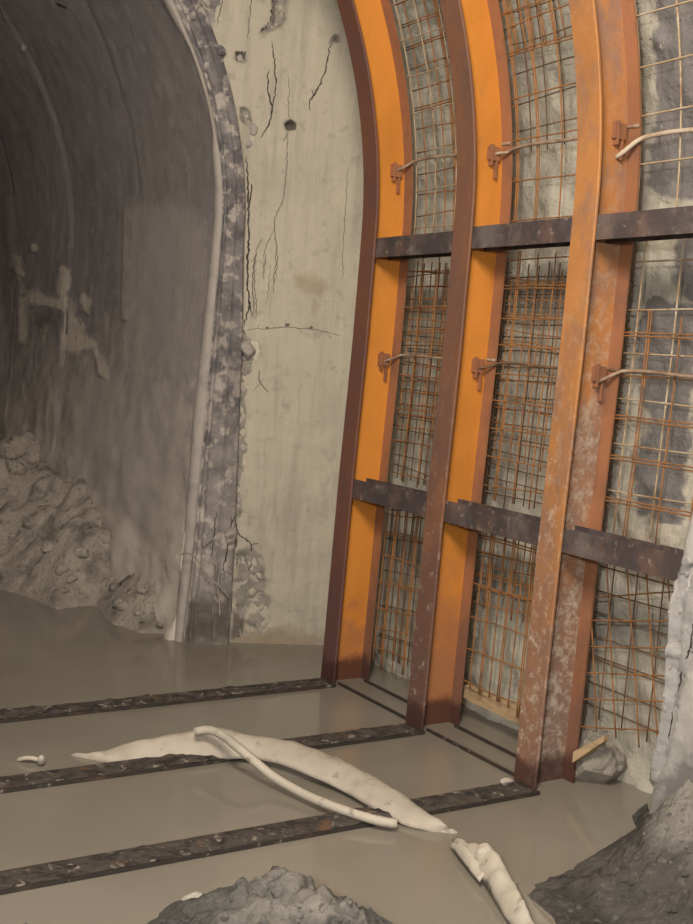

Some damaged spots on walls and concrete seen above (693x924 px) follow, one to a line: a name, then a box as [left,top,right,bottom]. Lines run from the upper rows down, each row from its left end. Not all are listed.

spalling [256,0,289,37]
crack [243,41,340,341]
spalling [236,330,262,520]
crack [211,512,258,571]
spalling [232,538,277,636]
crack [668,624,693,738]